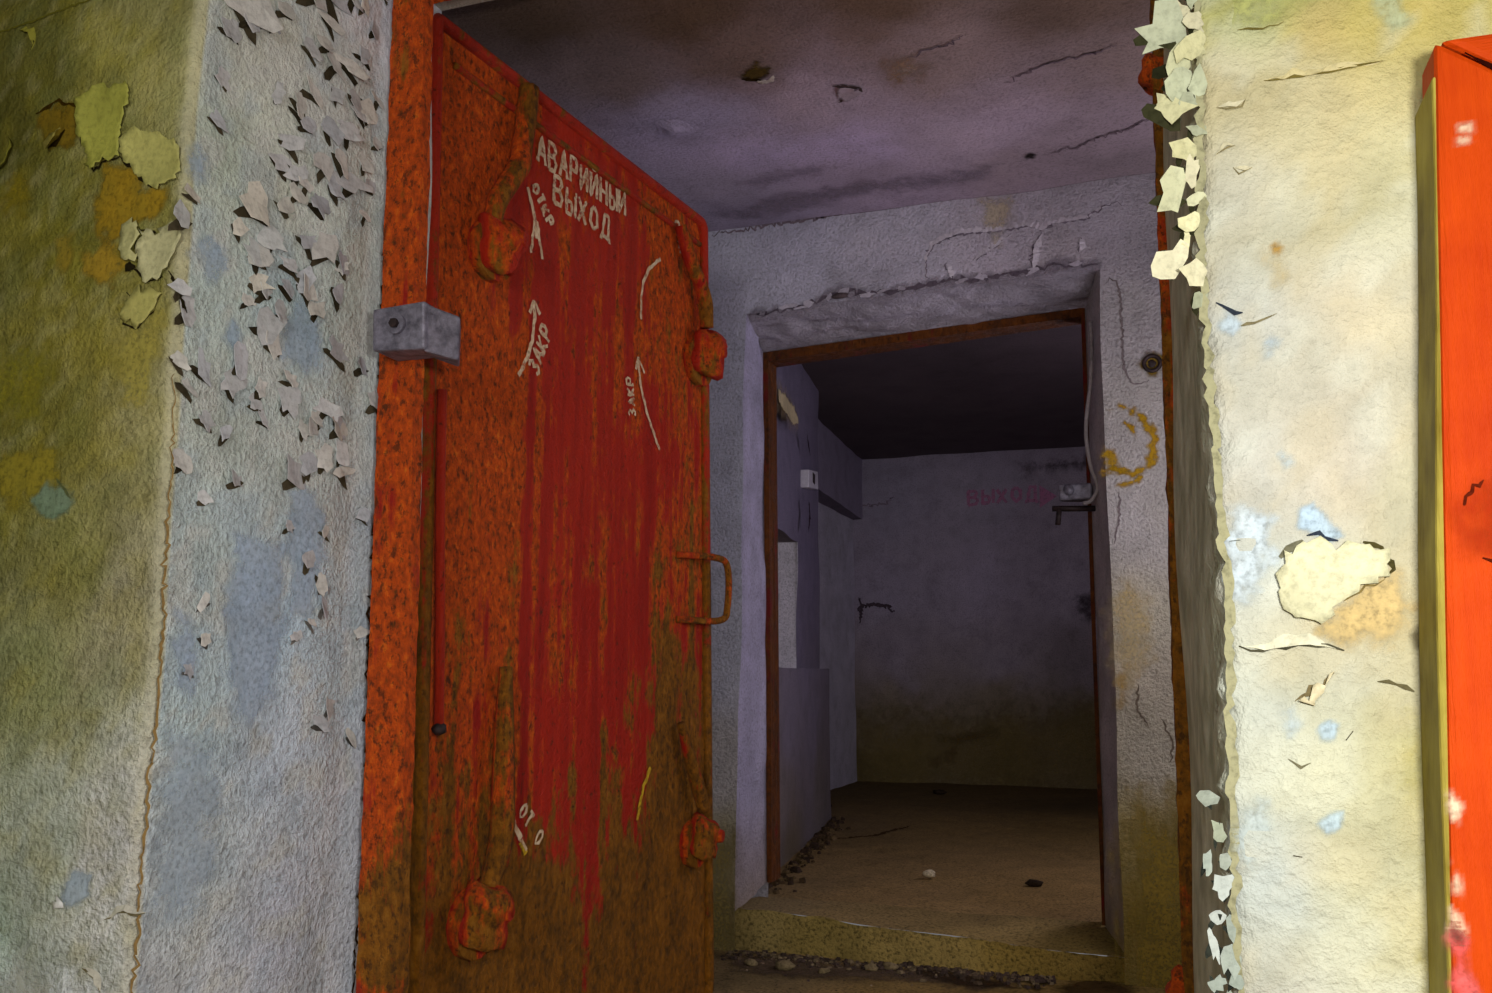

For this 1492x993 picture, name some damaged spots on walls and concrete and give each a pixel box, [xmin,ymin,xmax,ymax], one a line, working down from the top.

peeling [36,0,390,491]
crack [924,201,1123,284]
crack [1105,277,1149,385]
peeling [0,446,73,519]
peeling [197,469,243,506]
peeling [355,507,370,526]
crack [1114,494,1122,544]
peeling [1133,0,1419,993]
peeling [175,519,330,718]
peeling [311,696,357,749]
peeling [1449,797,1461,819]
peeling [1448,913,1479,993]